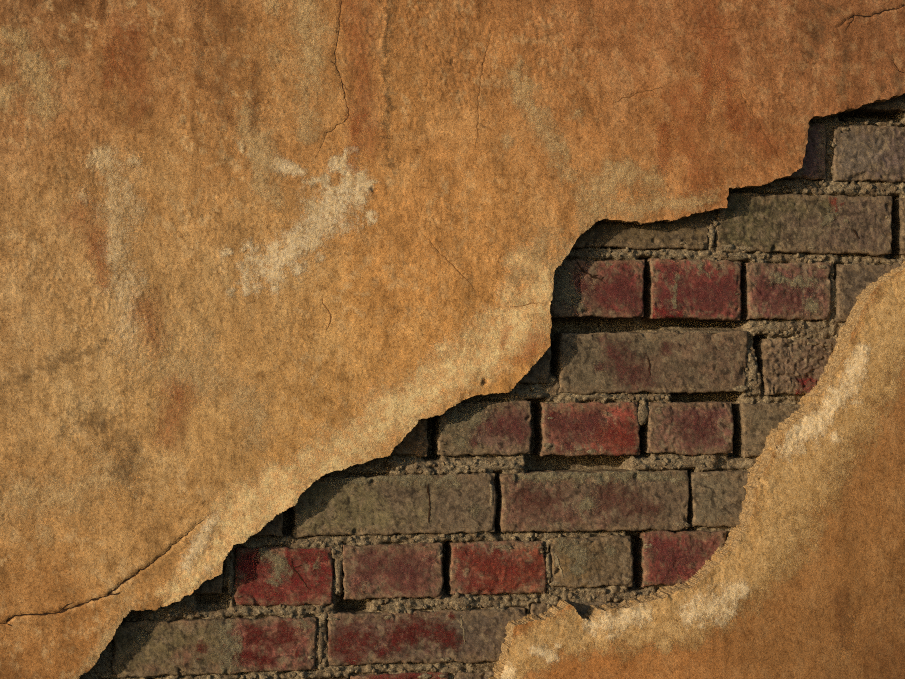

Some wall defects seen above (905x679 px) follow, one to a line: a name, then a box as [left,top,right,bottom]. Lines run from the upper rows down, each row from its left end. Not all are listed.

crack [840,4,905,29]
peeling [0,26,70,121]
crack [313,1,349,168]
crack [475,32,491,141]
peeling [85,143,274,452]
peeling [156,61,725,605]
peeling [0,450,128,541]
peeling [488,260,905,679]
crack [0,512,213,626]
peeling [72,606,133,679]
peeling [234,620,295,669]
peeling [328,613,458,665]